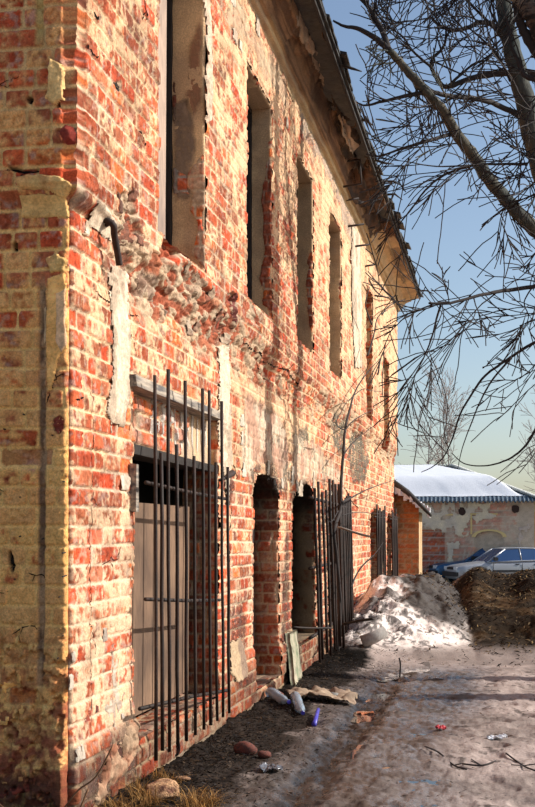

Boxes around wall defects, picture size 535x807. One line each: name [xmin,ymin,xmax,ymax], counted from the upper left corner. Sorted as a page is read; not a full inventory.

damp [174,100,194,178]
crack [6,168,39,176]
peeling [220,0,392,369]
peeling [83,187,144,246]
crack [242,339,302,390]